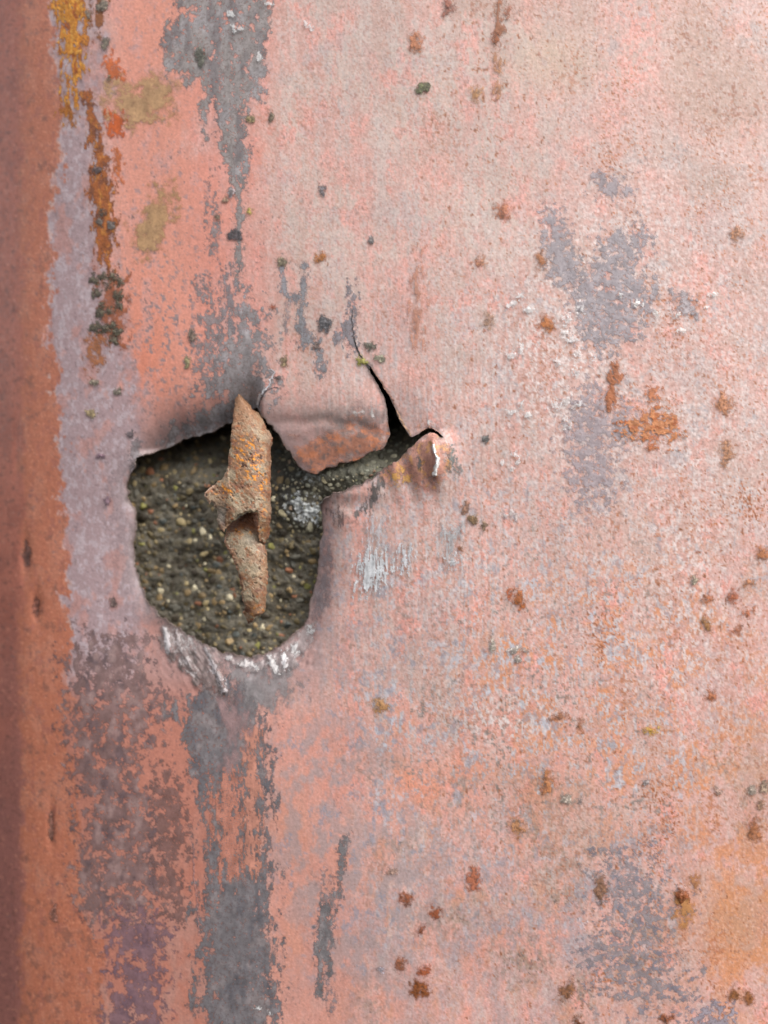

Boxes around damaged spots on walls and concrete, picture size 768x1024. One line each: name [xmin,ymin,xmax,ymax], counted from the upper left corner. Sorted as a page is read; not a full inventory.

corrosion [48,0,132,380]
peeling [126,430,143,473]
peeling [156,0,386,448]
crack [351,310,433,438]
peeling [537,166,699,519]
corrosion [601,356,688,451]
peeling [49,618,311,1024]